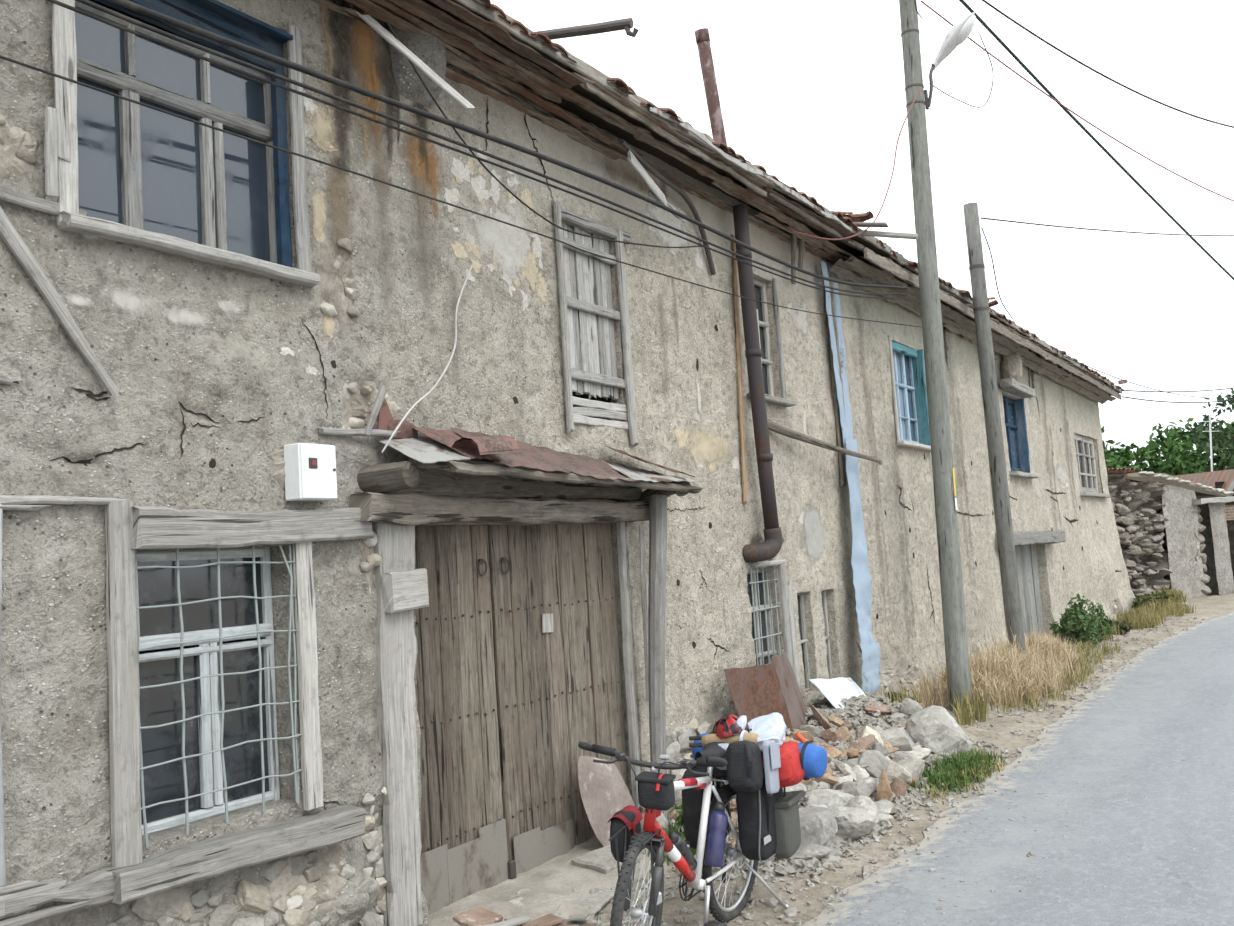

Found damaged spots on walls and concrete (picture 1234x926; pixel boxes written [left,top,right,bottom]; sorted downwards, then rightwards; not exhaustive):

corrosion [355,8,380,147]
spalling [0,115,39,178]
water stain [327,0,428,249]
peeling [443,148,547,313]
crack [71,387,110,401]
crack [299,316,328,419]
crack [50,443,144,469]
crack [178,401,266,460]
crack [897,485,914,512]